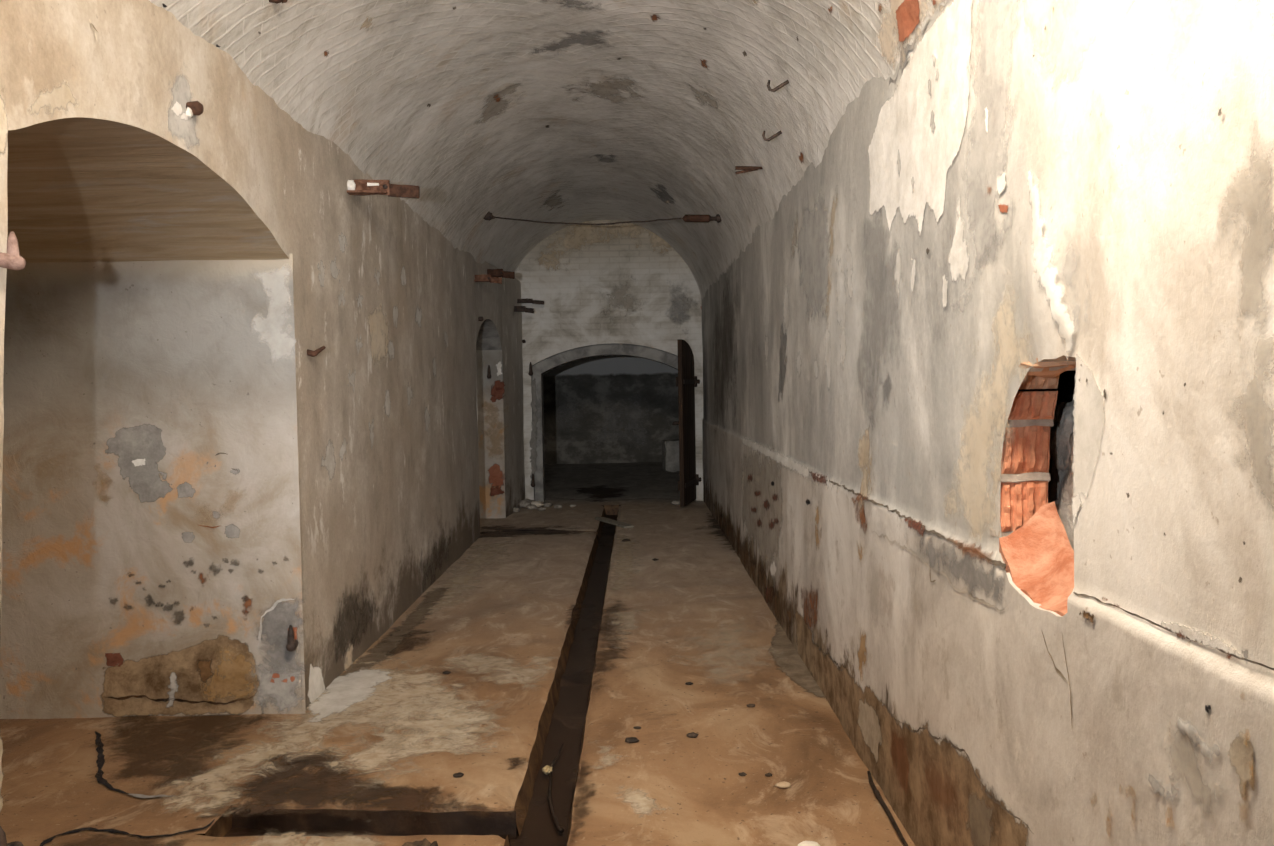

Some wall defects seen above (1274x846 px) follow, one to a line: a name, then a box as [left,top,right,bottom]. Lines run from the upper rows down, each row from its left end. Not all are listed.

peeling [868,0,973,234]
flaking render [996,172,1008,213]
peeling [894,248,929,293]
spalling [1018,364,1088,413]
flaking render [105,424,195,503]
crack [743,438,1006,612]
peeling [1072,493,1081,524]
crack [1073,592,1274,671]
damp [99,537,552,819]
damp [252,833,380,846]